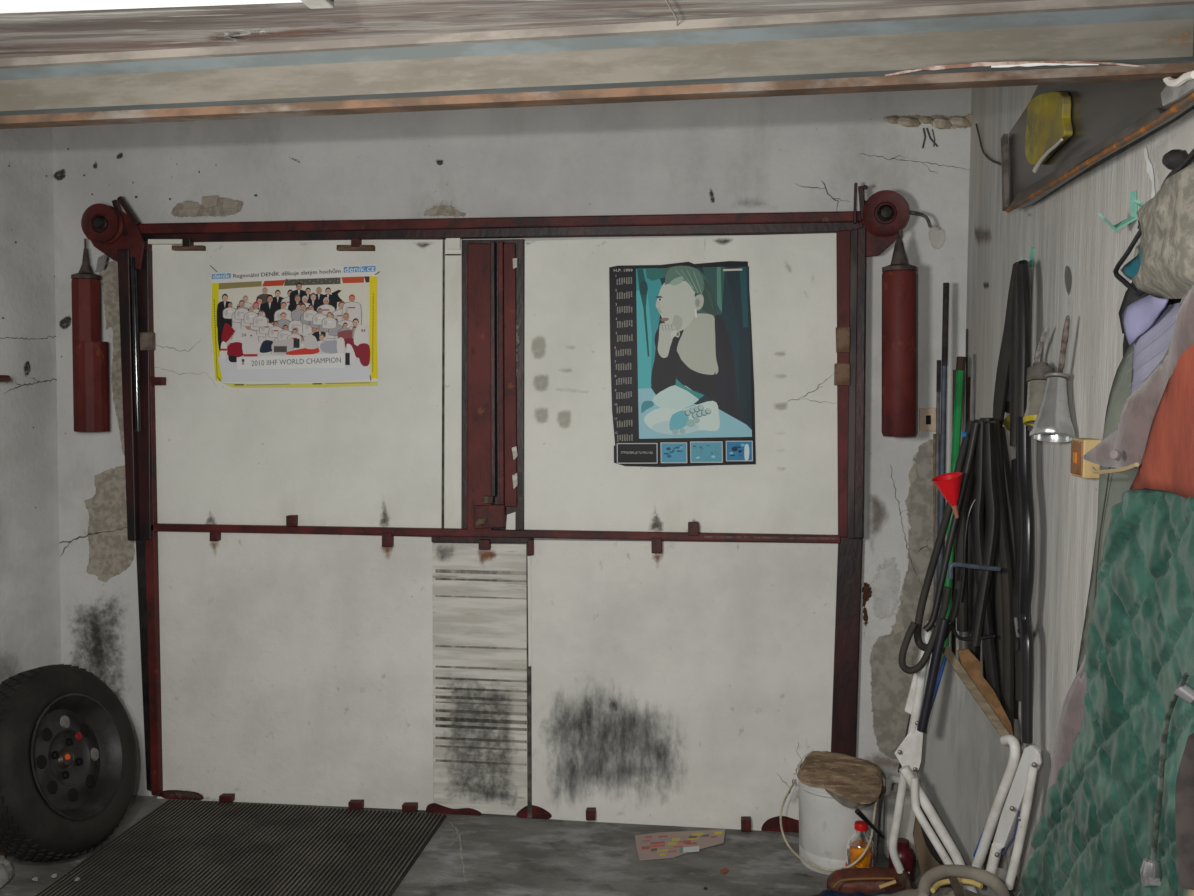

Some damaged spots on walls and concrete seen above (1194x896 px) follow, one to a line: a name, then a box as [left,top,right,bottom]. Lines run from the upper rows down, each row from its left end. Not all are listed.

peeling [171,195,243,217]
peeling [84,254,135,582]
water stain [76,605,122,696]
peeling [870,440,947,759]
water stain [452,688,508,797]
water stain [558,702,668,791]